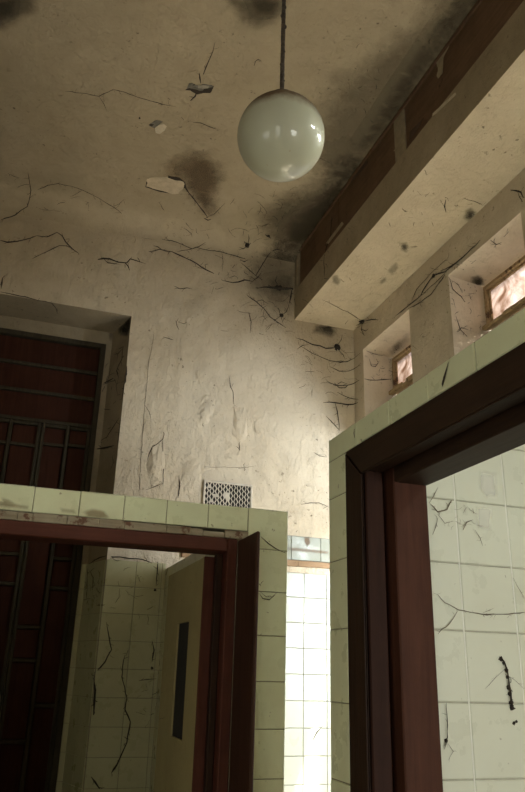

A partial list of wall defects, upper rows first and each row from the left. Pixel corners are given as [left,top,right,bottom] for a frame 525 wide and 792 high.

crack [67,44,217,129]
spalling [186,71,217,94]
peeling [145,176,186,194]
crack [0,173,122,258]
crack [185,187,223,221]